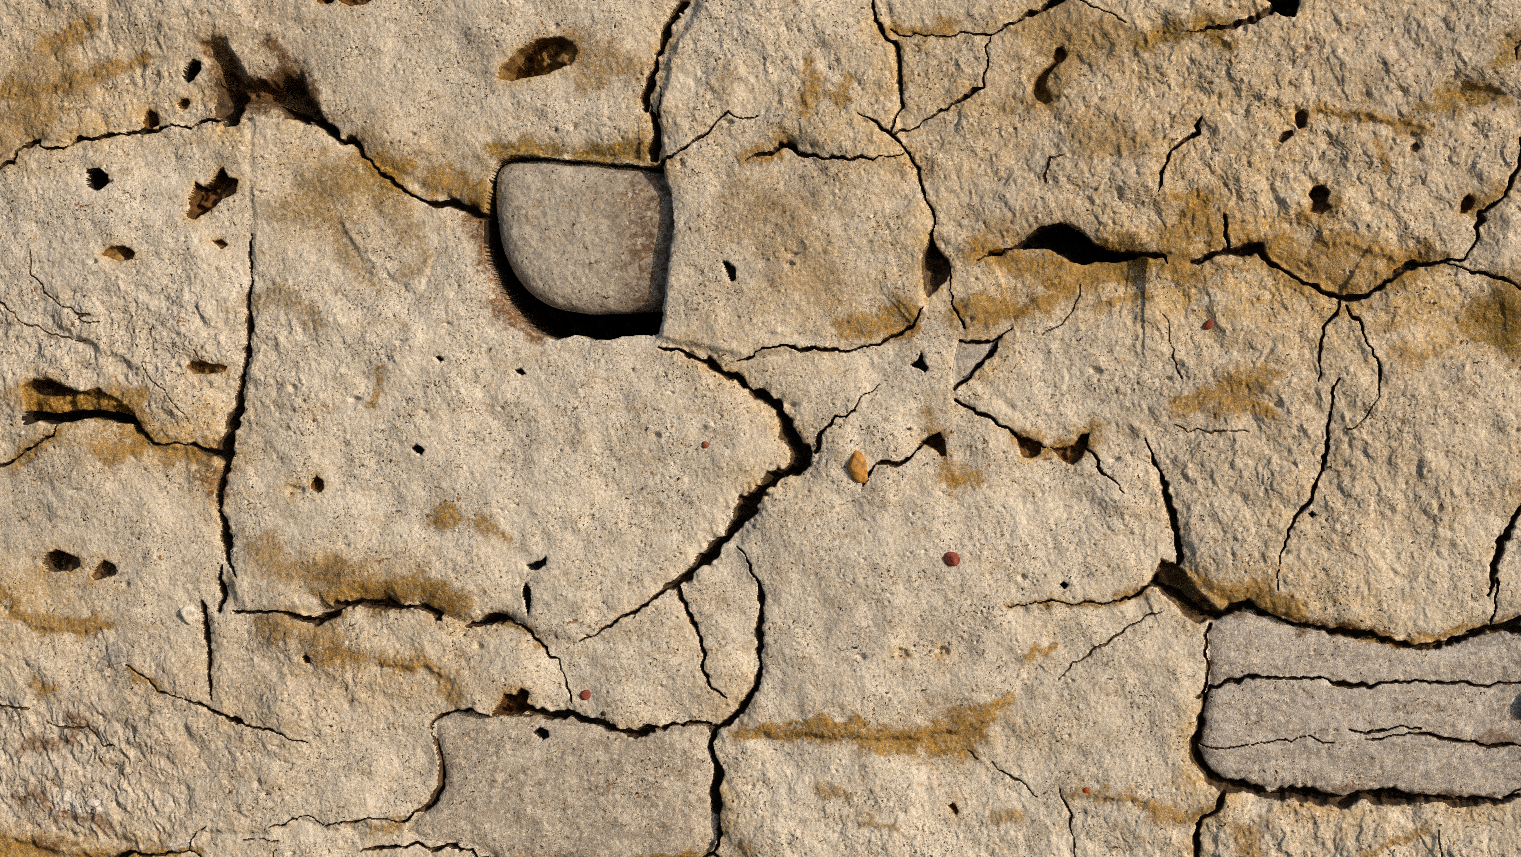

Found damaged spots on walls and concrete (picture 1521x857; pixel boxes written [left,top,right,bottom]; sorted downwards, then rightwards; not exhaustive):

crack [1187,0,1298,33]
crack [1513,40,1521,60]
crack [0,77,499,223]
crack [1158,116,1203,192]
spalling [483,156,665,340]
crack [0,250,100,342]
crack [0,424,58,468]
crack [114,0,1126,857]
crack [1007,137,1521,857]
crack [0,704,115,747]
spalling [533,727,549,740]